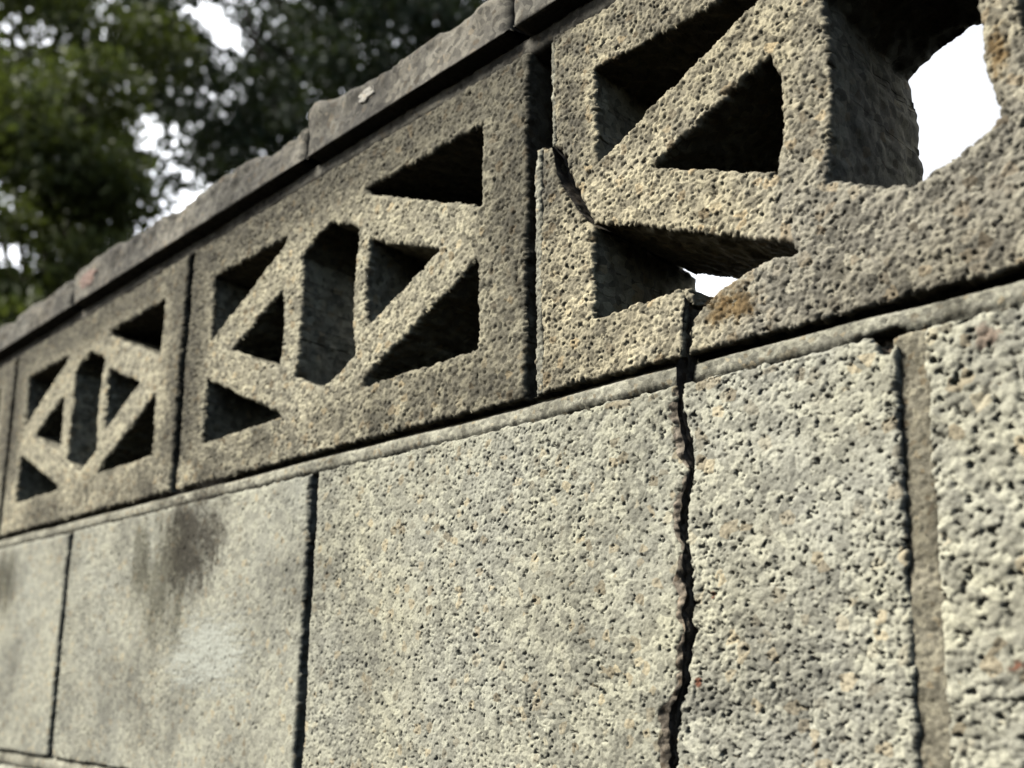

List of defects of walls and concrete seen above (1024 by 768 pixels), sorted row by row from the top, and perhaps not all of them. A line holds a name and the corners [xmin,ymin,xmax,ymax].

crack [552,146,634,244]
damp [174,496,218,582]
crack [657,297,700,768]